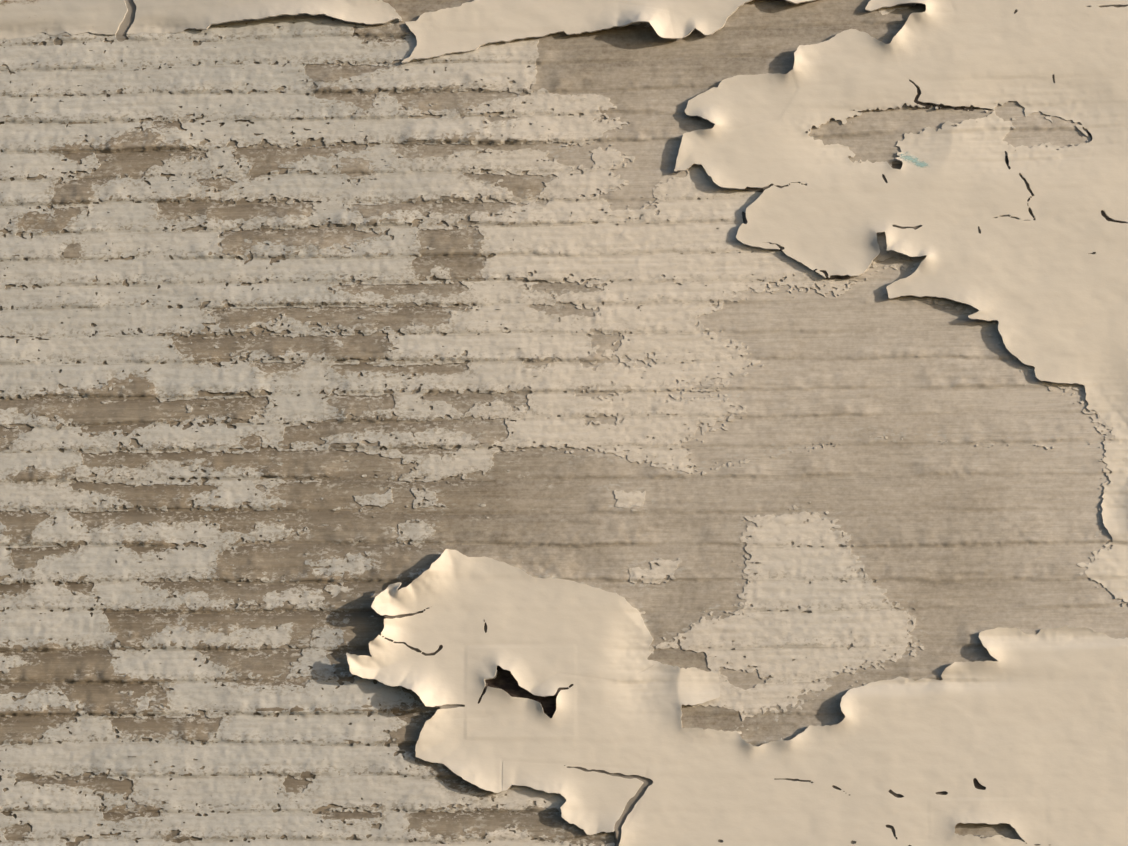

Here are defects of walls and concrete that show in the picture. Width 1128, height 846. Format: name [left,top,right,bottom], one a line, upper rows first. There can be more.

peeling [16,116,208,233]
peeling [157,0,954,377]
peeling [806,101,1091,169]
peeling [63,243,81,260]
peeling [0,257,1128,846]